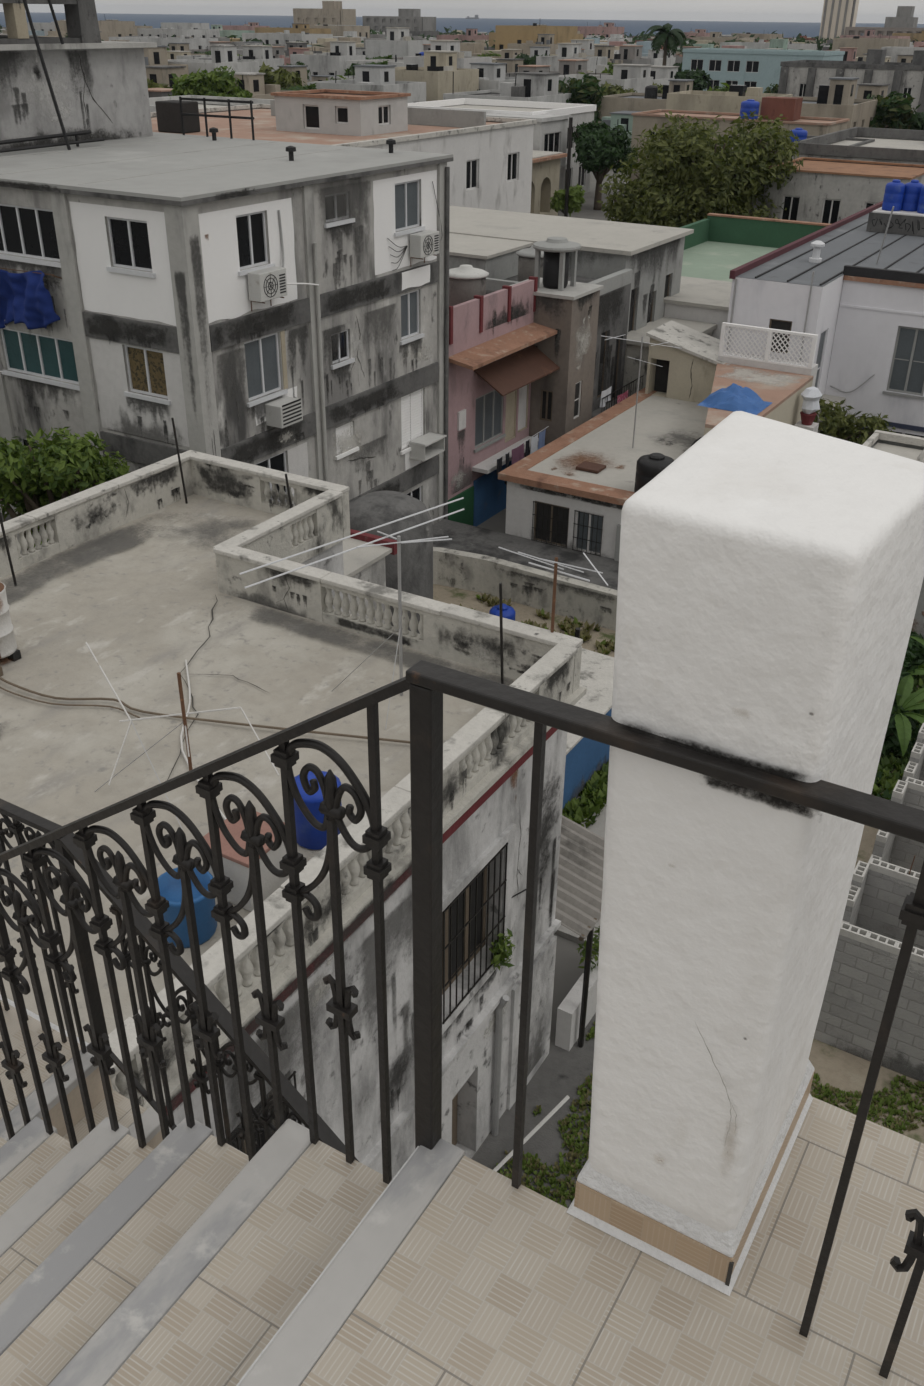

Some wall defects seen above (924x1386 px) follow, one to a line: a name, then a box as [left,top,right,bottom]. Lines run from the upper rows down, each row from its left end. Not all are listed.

water stain [0,50,133,149]
water stain [0,259,66,327]
water stain [87,317,165,348]
water stain [175,181,422,507]
water stain [17,378,69,417]
water stain [114,397,176,445]
crack [167,595,269,780]
water stain [443,769,467,808]
crack [696,1025,737,1143]